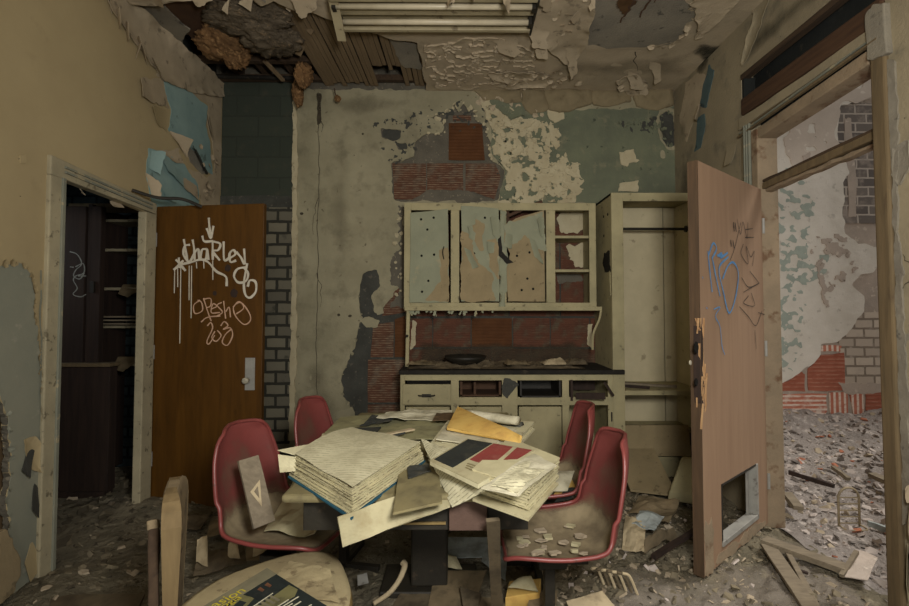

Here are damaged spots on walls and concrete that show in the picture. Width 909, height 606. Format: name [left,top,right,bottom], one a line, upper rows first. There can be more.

peeling [108,0,225,207]
peeling [291,0,317,19]
flaking render [331,0,740,423]
peeling [741,0,769,66]
flaking render [777,79,871,173]
flaking render [778,159,882,414]
peeling [0,258,44,593]